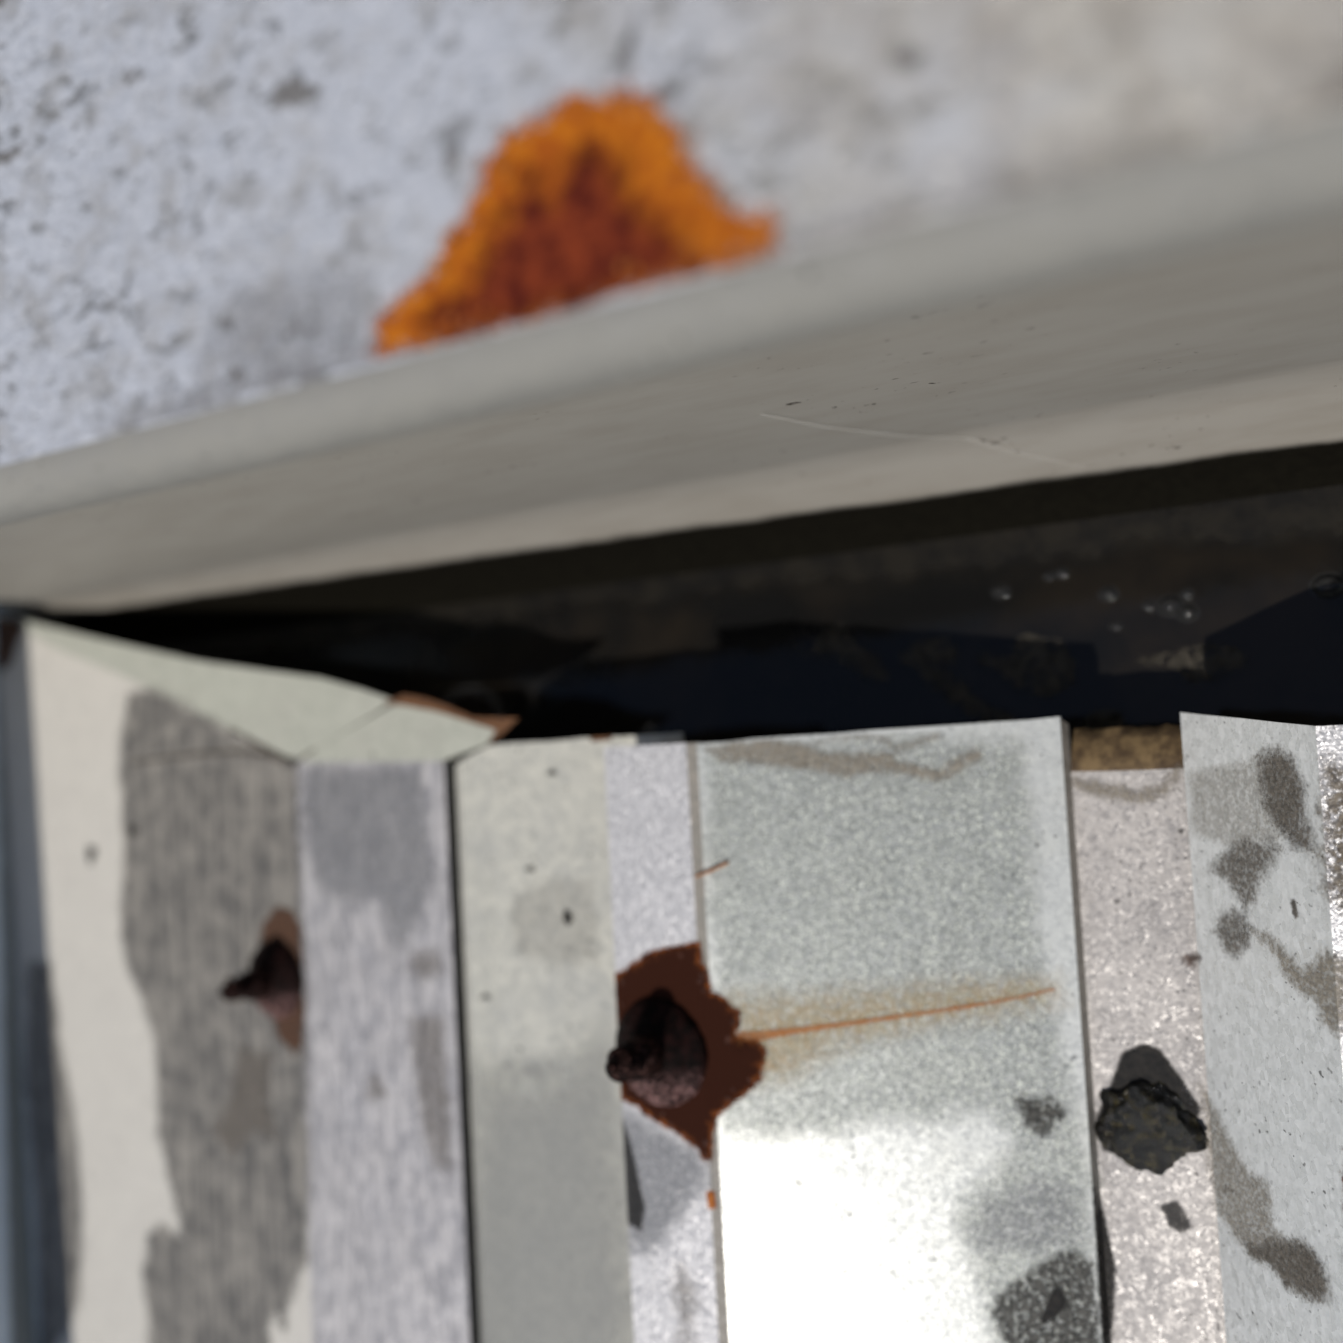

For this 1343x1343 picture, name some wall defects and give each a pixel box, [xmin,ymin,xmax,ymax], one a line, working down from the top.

rust [367,80,783,359]
rust [260,906,305,1055]
rust [615,941,1054,1162]
damp [713,741,1085,1343]
damp [1212,840,1343,1033]